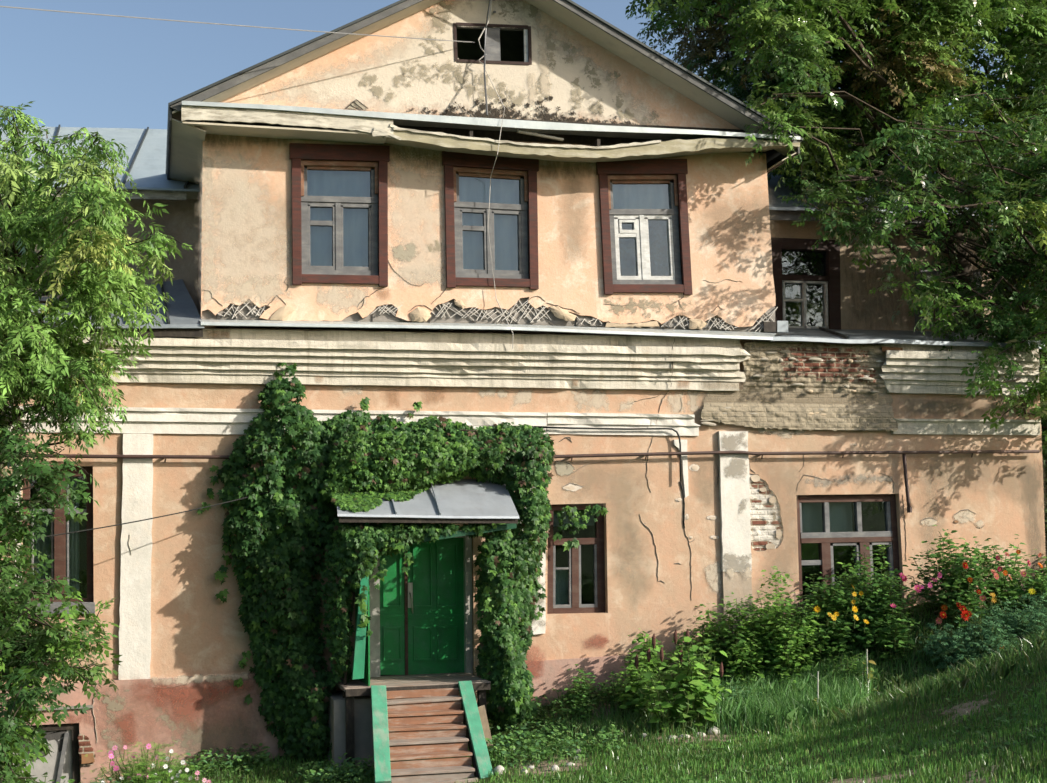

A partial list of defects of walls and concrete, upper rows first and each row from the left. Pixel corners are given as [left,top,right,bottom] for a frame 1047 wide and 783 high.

peeling [264,0,659,125]
peeling [317,286,402,322]
flaking render [430,300,551,325]
flaking render [576,316,602,326]
flaking render [604,298,788,333]
crack [627,338,682,491]
spalling [706,432,783,596]
crack [640,485,695,600]
leakage [151,673,248,686]